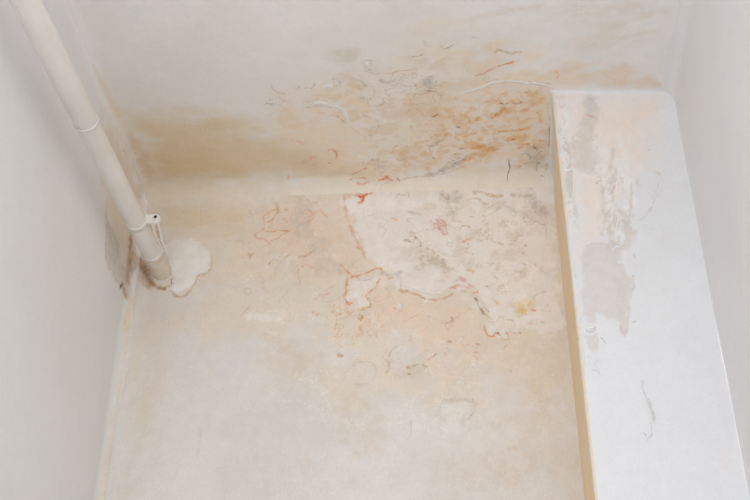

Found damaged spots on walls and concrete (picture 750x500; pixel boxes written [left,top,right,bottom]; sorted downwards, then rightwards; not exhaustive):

damp [91,0,681,500]
peeling [321,91,639,356]